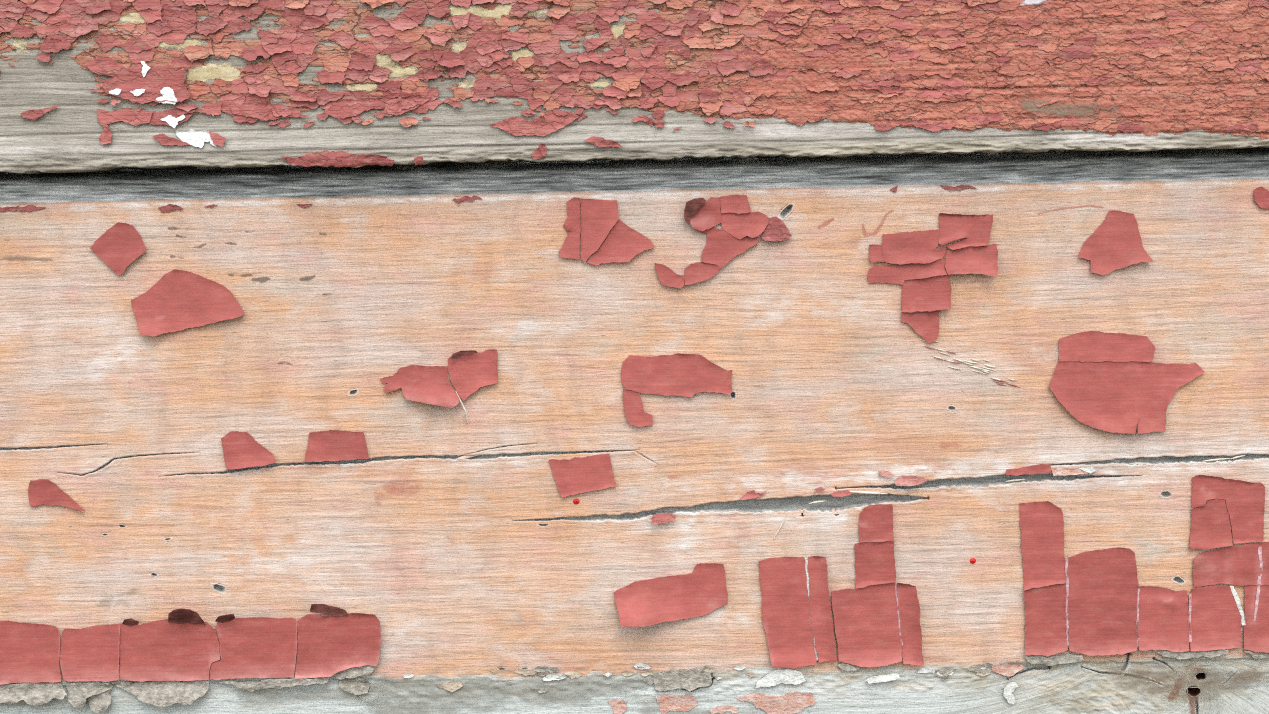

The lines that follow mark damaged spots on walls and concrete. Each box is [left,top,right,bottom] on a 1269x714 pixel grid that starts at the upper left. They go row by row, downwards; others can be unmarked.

peeling [0,0,1211,160]
peeling [282,150,394,168]
peeling [131,269,245,336]
peeling [558,197,655,266]
peeling [655,194,796,288]
peeling [867,213,998,343]
peeling [1049,331,1205,434]
crack [0,440,659,480]
crack [512,451,1269,524]
peeling [614,563,728,627]
peeling [710,475,1269,714]
peeling [0,604,381,714]